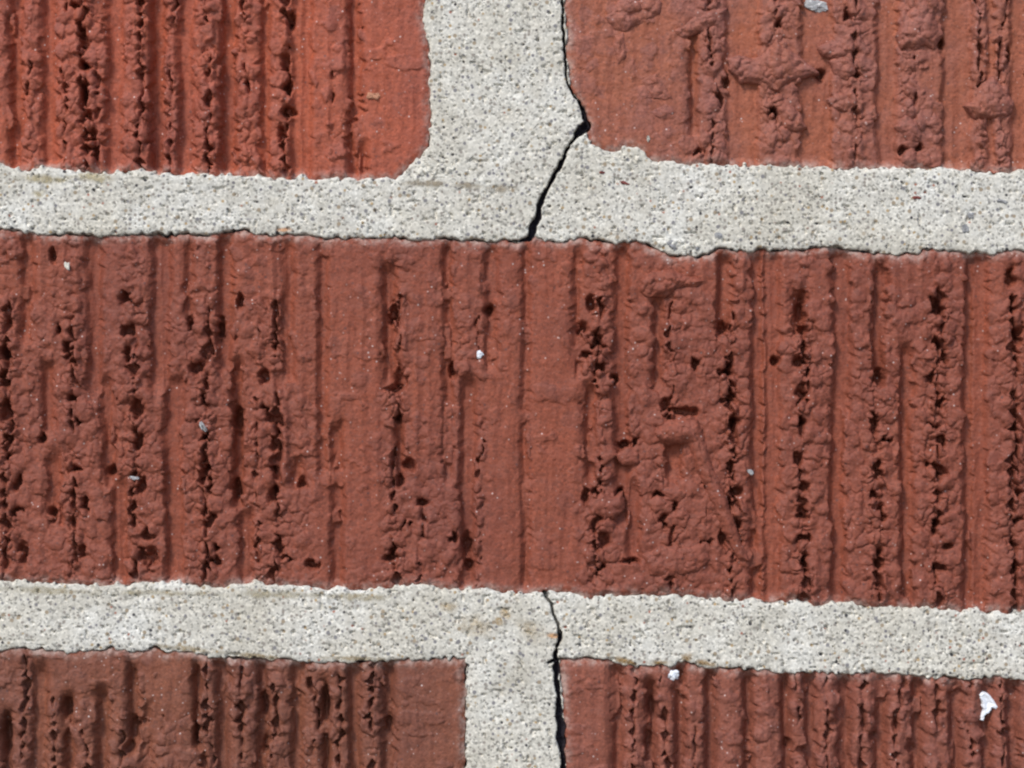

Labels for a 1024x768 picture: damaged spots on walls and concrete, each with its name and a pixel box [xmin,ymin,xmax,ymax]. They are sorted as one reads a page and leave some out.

crack [509,0,611,243]
crack [543,591,566,768]